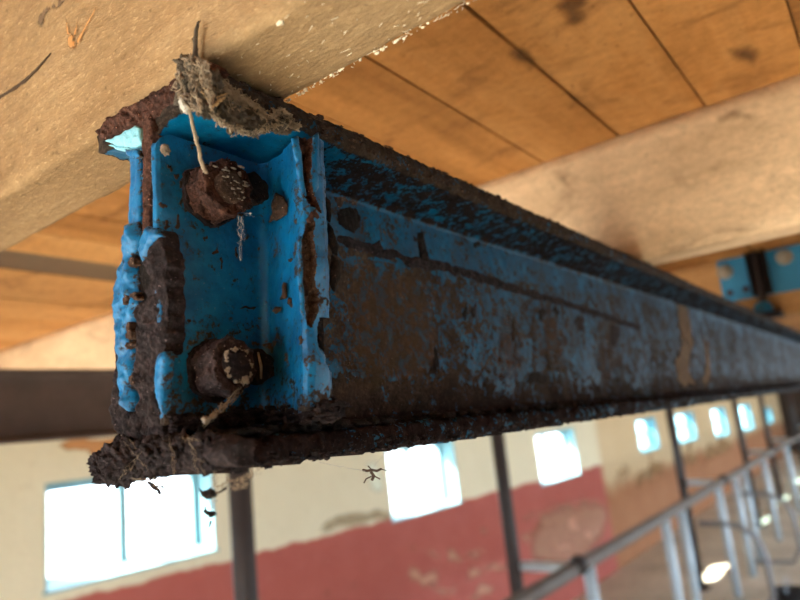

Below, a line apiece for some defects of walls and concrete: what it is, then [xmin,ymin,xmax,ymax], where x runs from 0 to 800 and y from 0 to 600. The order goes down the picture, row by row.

rust [95,78,177,159]
spalling [333,196,361,234]
spalling [297,220,322,328]
peeling [108,226,186,439]
rust [166,395,350,435]